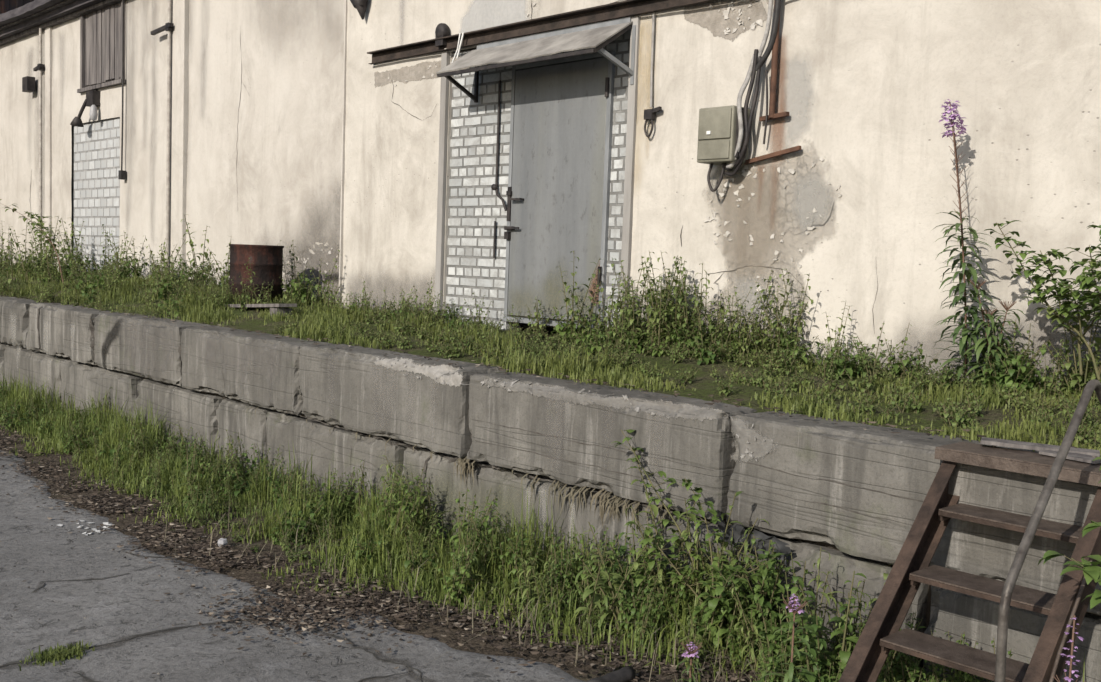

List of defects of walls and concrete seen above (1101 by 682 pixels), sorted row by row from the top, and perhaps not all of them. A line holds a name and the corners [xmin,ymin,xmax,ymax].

peeling [684,0,775,41]
spalling [374,57,467,87]
rust [773,40,783,158]
peeling [704,160,795,245]
peeling [756,232,803,292]
crack [266,360,714,523]
spalling [374,357,778,463]
crack [741,461,923,525]